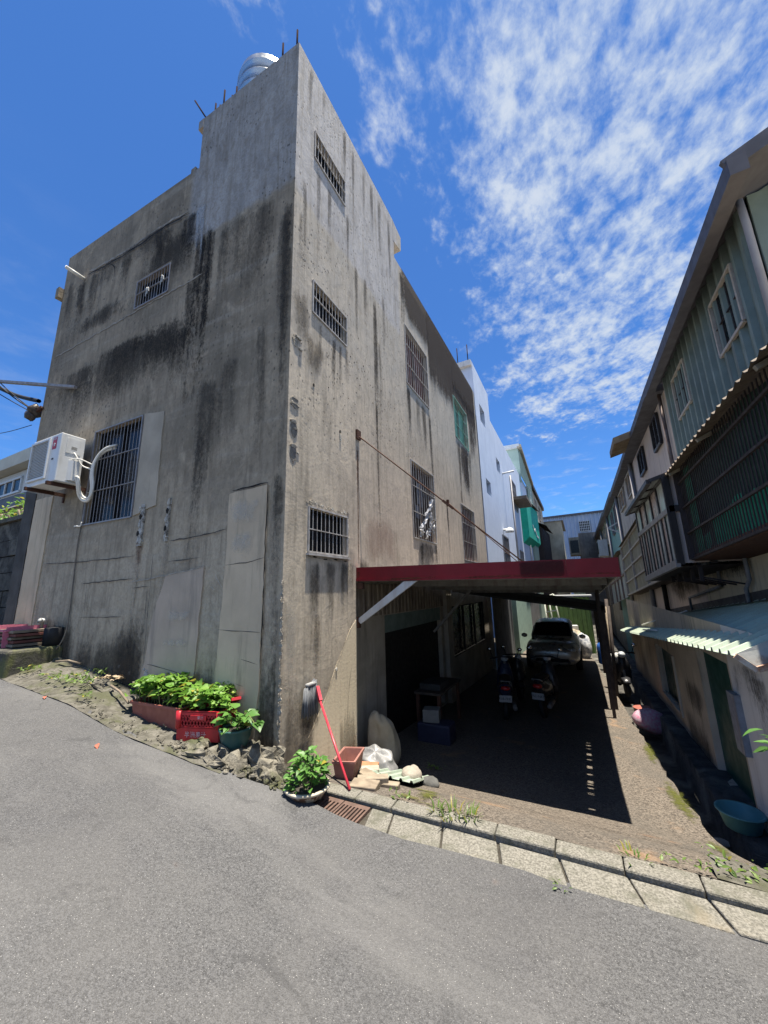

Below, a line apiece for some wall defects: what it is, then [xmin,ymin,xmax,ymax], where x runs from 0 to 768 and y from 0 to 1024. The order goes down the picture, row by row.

water stain [68,206,225,400]
water stain [279,207,307,339]
water stain [310,341,347,366]
water stain [311,564,348,605]
water stain [54,625,140,690]